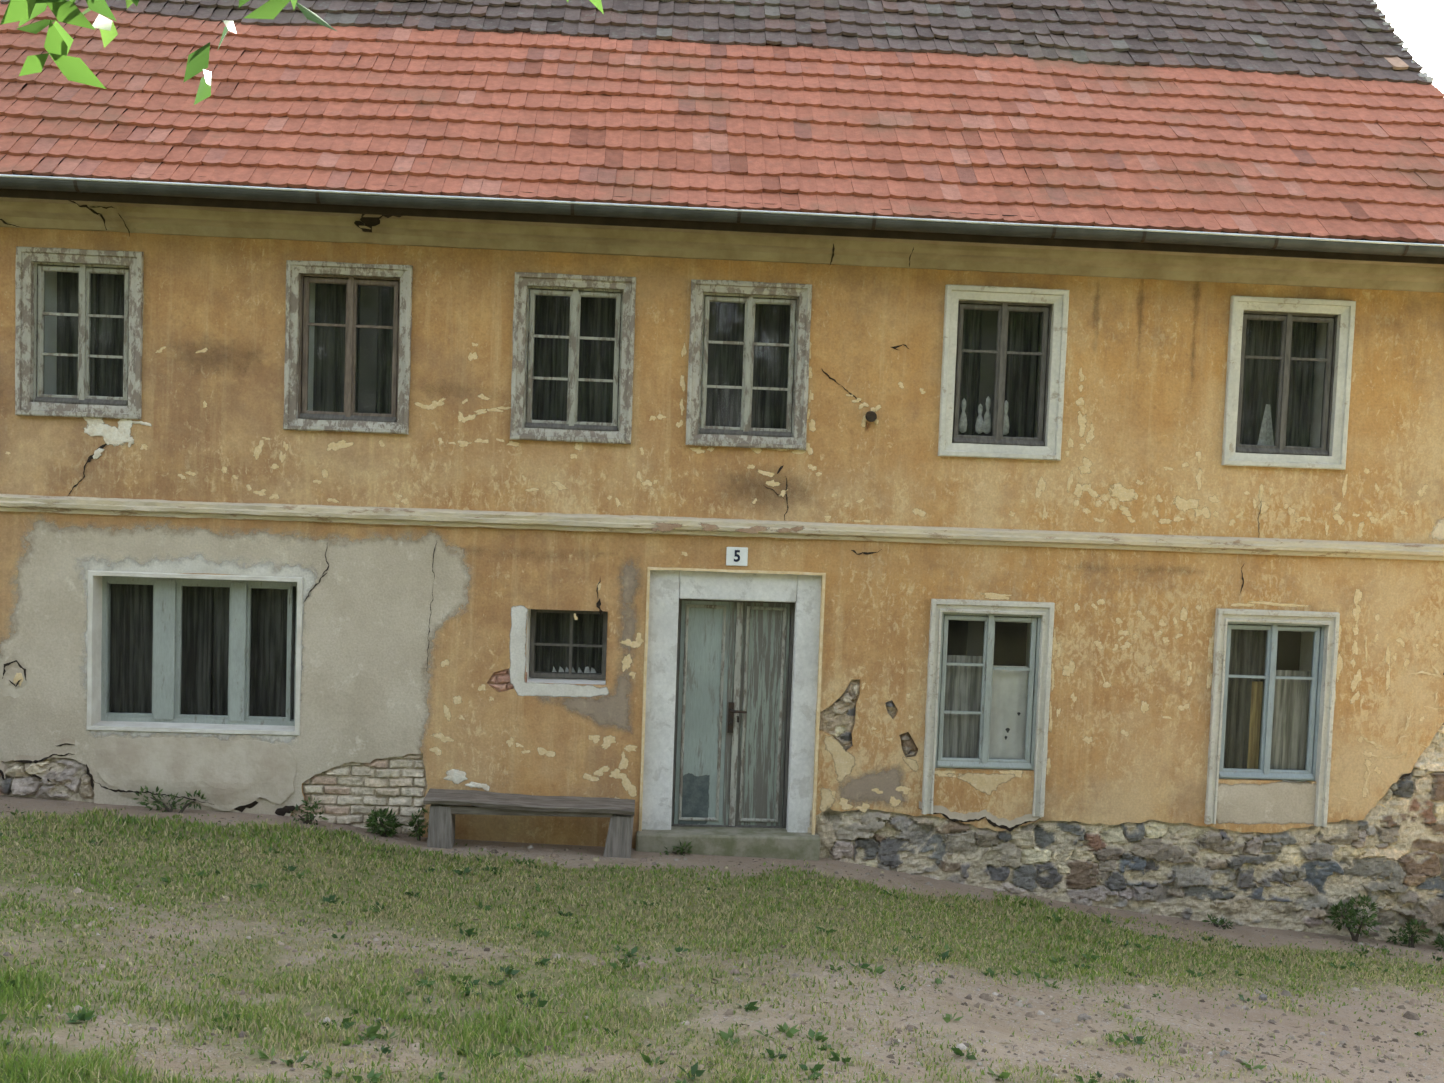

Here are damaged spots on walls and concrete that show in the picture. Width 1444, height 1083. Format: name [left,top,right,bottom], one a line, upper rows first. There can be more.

flaking render [83,417,152,459]
crack [69,444,107,494]
peeling [221,467,279,500]
peeling [1431,519,1444,540]
crack [303,542,329,603]
flaking render [478,669,527,701]
flaking render [0,757,95,802]
crack [0,738,214,805]
flaking render [291,695,490,835]
peeling [506,737,556,757]
flaking render [815,679,918,818]
peeling [935,770,1023,795]